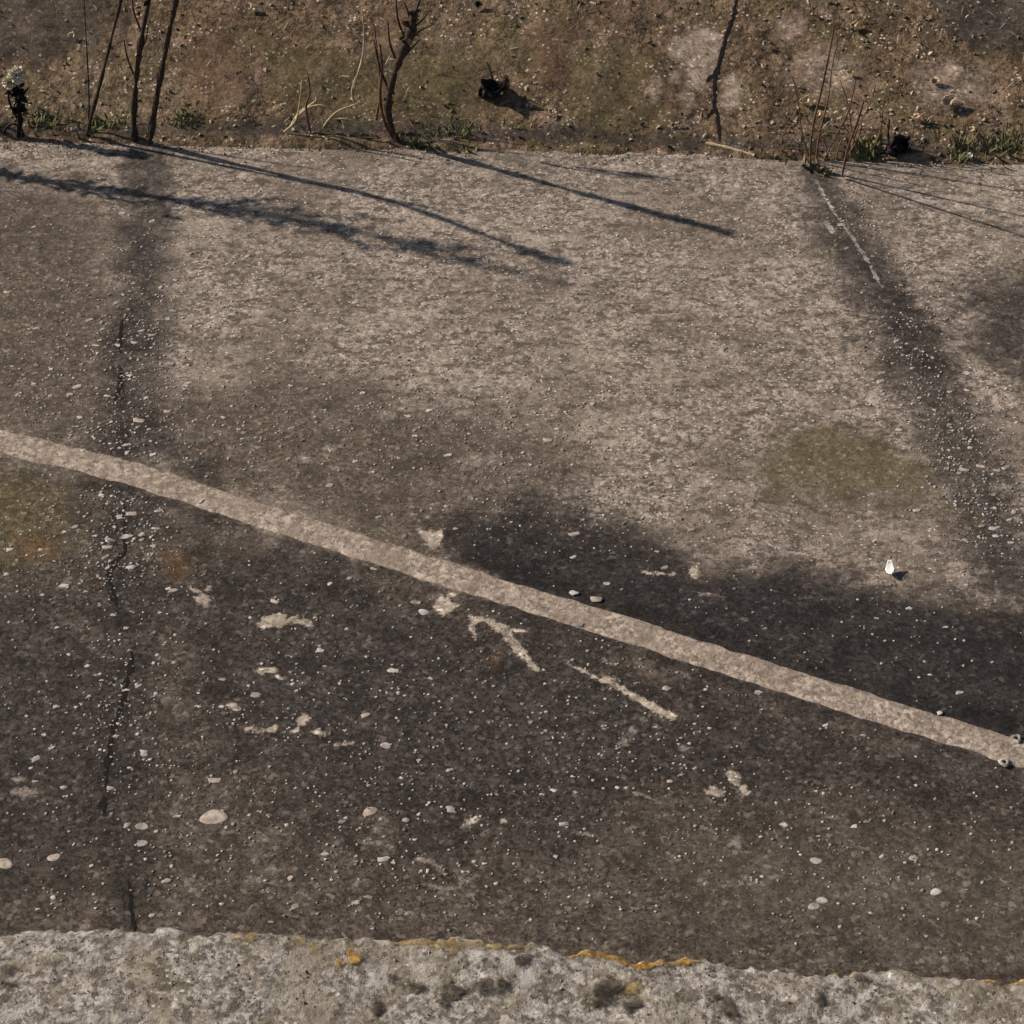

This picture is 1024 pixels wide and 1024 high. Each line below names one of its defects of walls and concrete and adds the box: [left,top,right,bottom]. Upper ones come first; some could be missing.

crack [114,319,123,401]
crack [106,500,126,608]
crack [97,650,134,813]
crack [127,879,136,931]